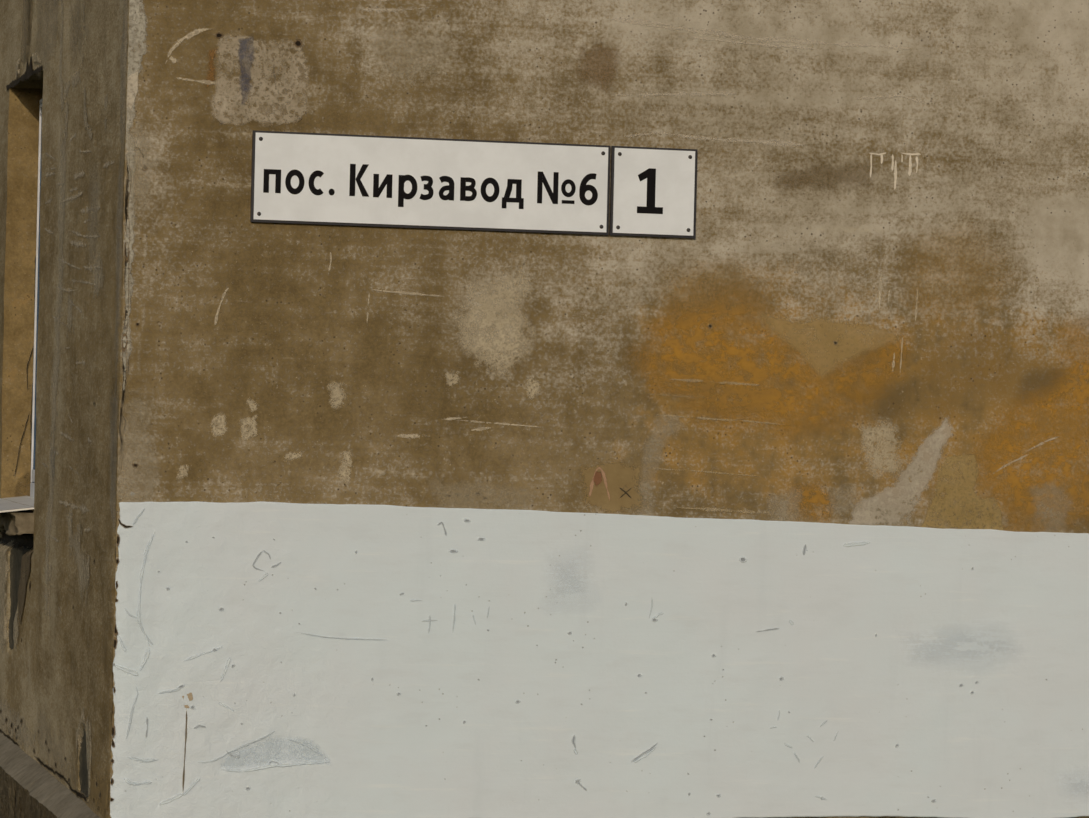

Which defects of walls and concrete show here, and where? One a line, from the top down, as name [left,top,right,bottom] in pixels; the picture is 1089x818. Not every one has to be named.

peeling [863,425,897,471]